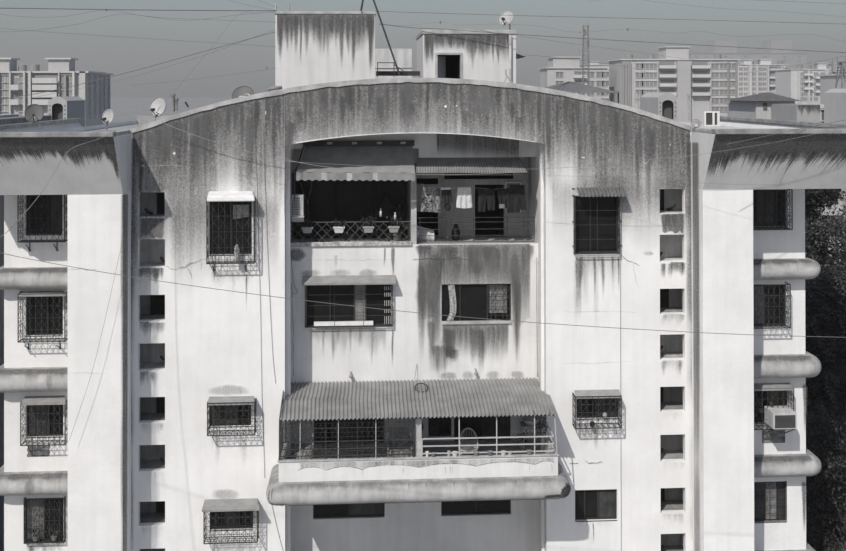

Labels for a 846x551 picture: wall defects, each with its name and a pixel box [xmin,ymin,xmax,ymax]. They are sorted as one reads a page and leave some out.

water stain [277,14,374,58]
water stain [424,34,509,56]
water stain [121,82,699,551]